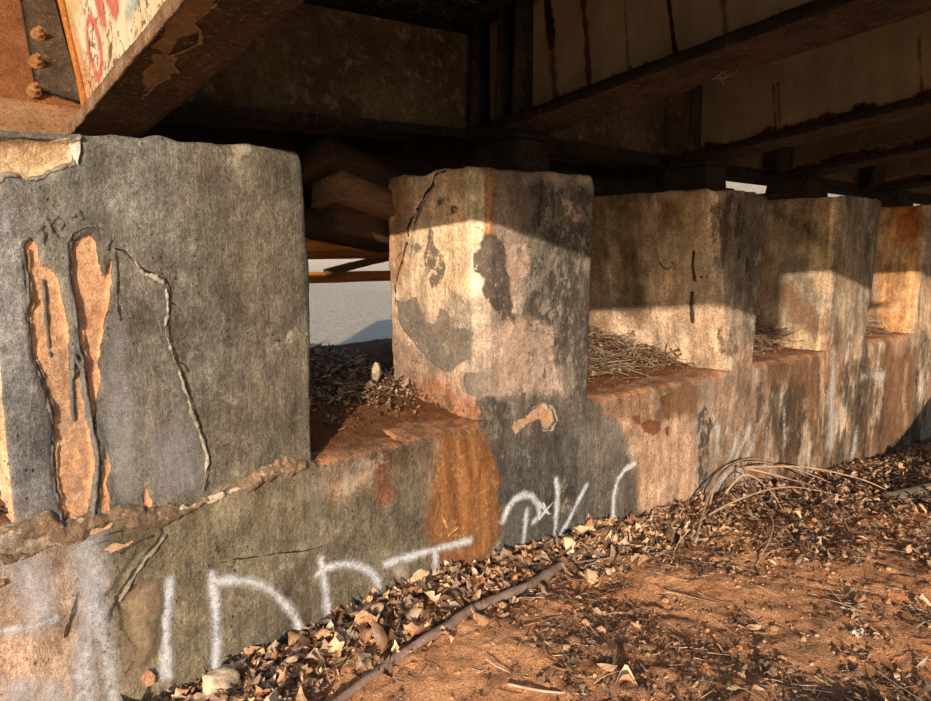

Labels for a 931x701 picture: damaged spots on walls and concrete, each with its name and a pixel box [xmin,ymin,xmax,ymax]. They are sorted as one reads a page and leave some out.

corrosion [544,0,558,99]
corrosion [580,0,592,86]
spalling [0,134,83,183]
crack [394,170,447,302]
spalling [0,209,308,587]
crack [114,248,210,491]
corrosion [425,423,502,574]
damp [473,178,594,435]
flaking render [512,402,558,434]
damp [633,386,752,497]
damp [846,361,884,462]
crack [63,527,167,674]